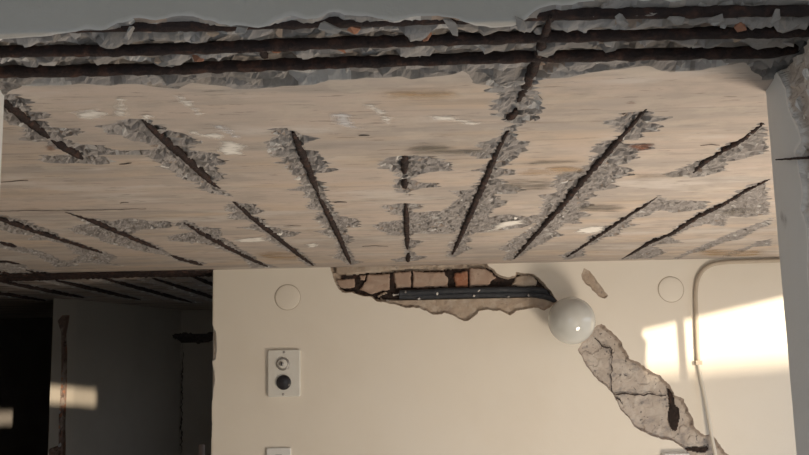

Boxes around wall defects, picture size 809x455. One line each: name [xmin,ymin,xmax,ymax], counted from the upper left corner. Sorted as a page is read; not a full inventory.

spalling [0,0,809,321]
flaking render [49,315,70,455]
flaking render [578,324,728,455]